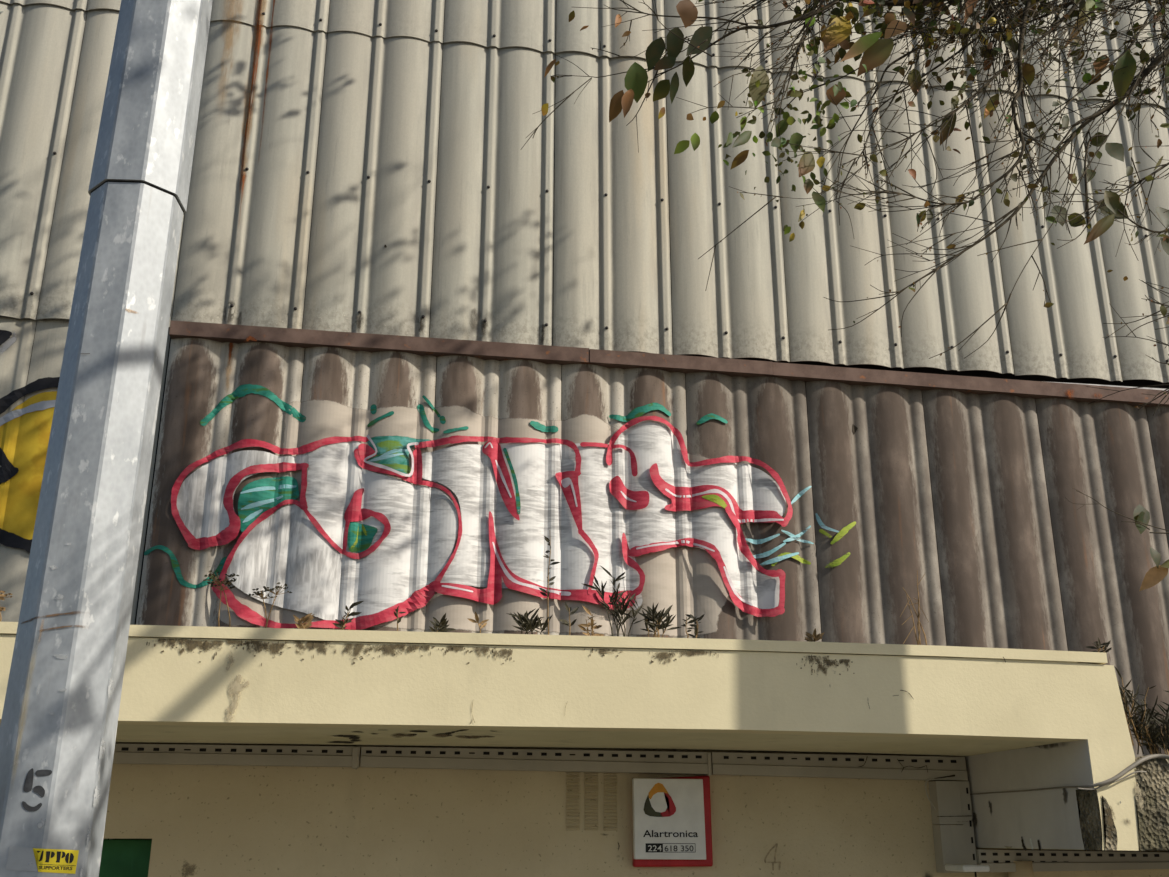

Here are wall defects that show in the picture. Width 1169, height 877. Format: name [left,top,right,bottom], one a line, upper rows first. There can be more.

rust [240,0,275,209]
damp [649,650,717,665]